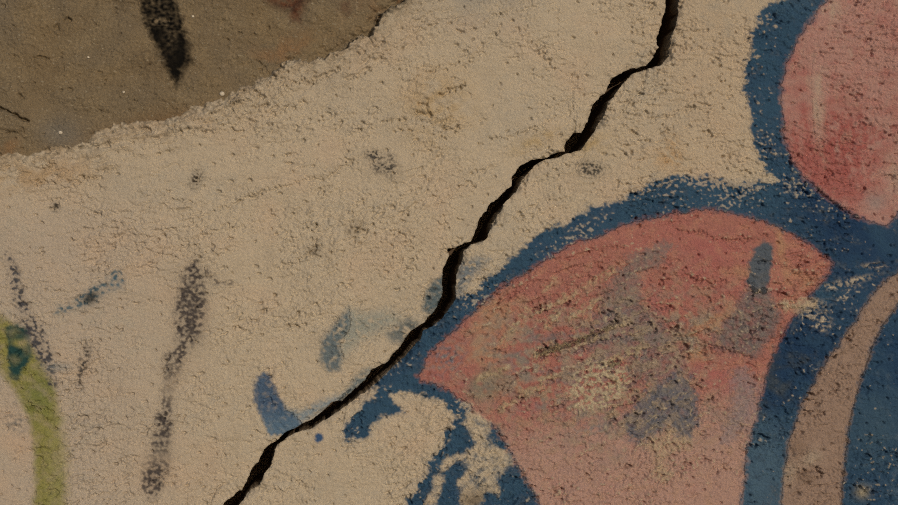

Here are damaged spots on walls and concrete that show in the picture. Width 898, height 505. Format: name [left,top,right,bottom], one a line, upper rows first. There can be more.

spalling [0,0,421,165]
crack [208,0,682,505]